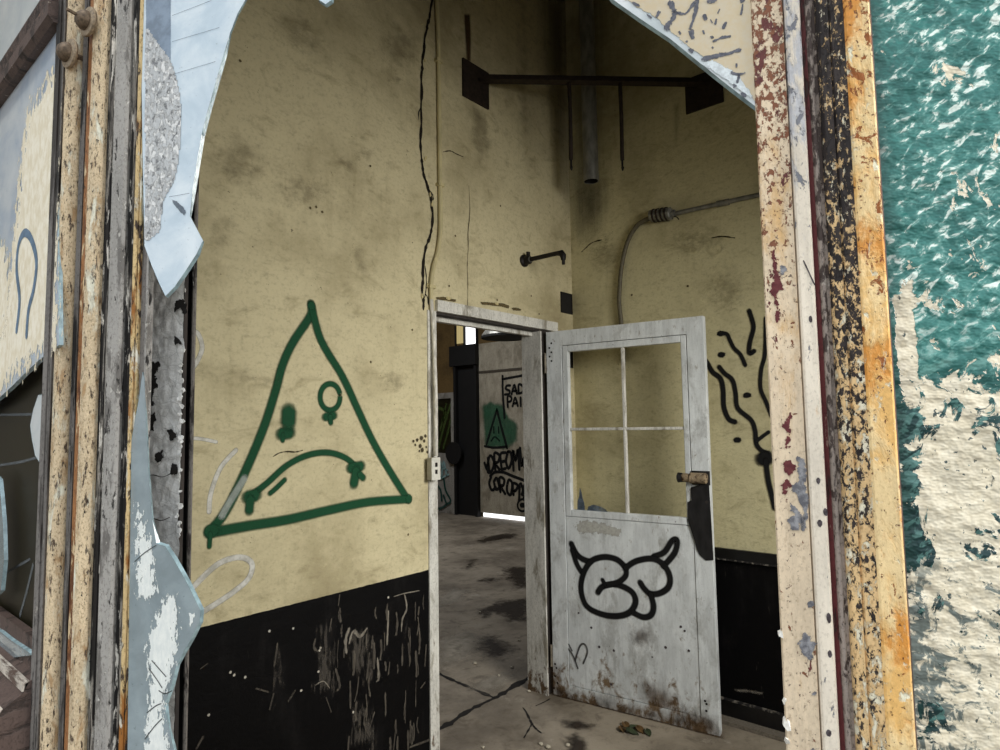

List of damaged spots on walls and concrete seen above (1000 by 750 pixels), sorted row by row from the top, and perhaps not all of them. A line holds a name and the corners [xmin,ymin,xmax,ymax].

crack [418,0,463,310]
spalling [56,205,64,348]
peeling [769,250,787,323]
peeling [781,412,828,531]
peeling [797,632,817,660]
flaking render [782,697,791,744]